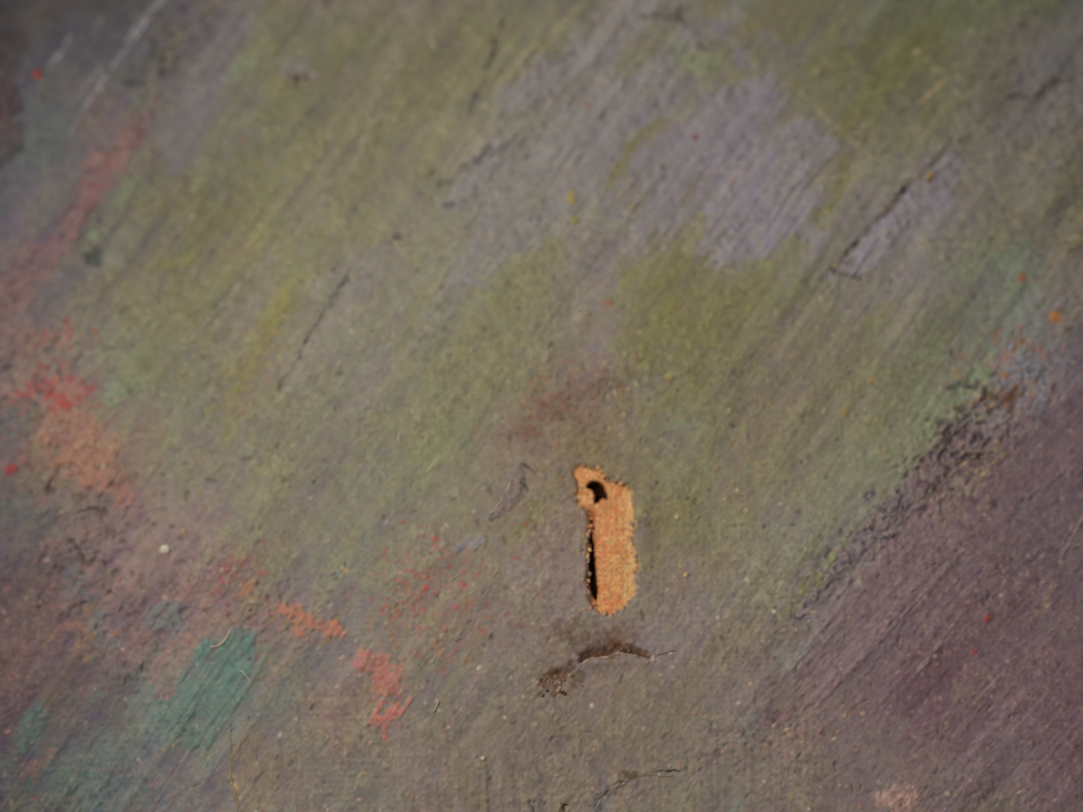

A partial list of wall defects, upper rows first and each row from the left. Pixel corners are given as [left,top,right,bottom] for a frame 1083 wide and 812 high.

crack [832,140,961,280]
peeling [572,464,639,617]